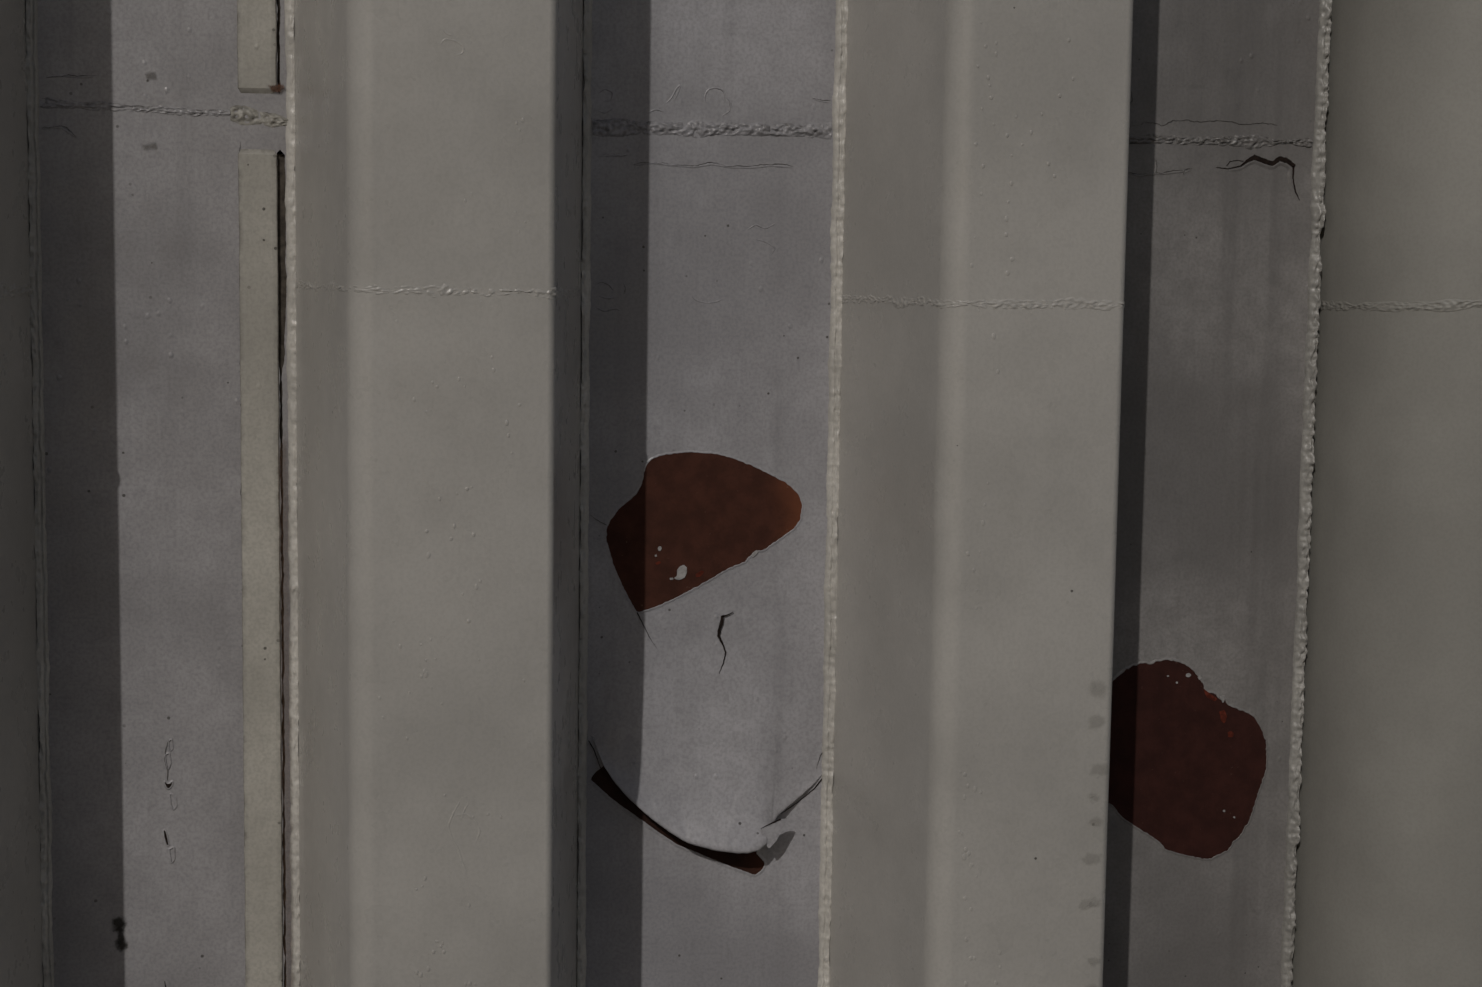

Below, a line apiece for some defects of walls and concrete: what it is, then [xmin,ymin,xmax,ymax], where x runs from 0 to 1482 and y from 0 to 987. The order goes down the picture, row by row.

crack [1128,98,1300,201]
crack [717,612,733,673]
peeling [761,819,788,848]